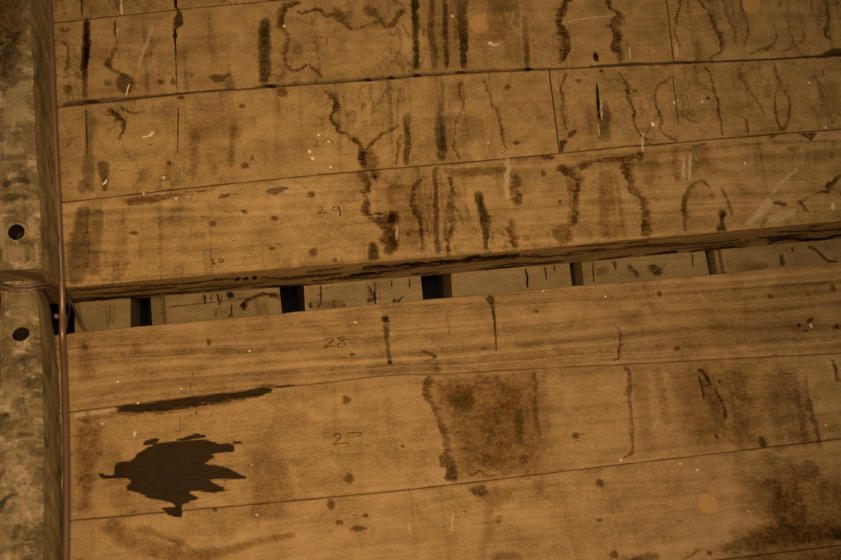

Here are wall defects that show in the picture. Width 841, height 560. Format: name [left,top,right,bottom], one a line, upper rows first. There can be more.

damp [81,0,91,80]
damp [411,1,419,68]
damp [458,8,468,66]
damp [476,193,490,248]
damp [557,154,651,232]